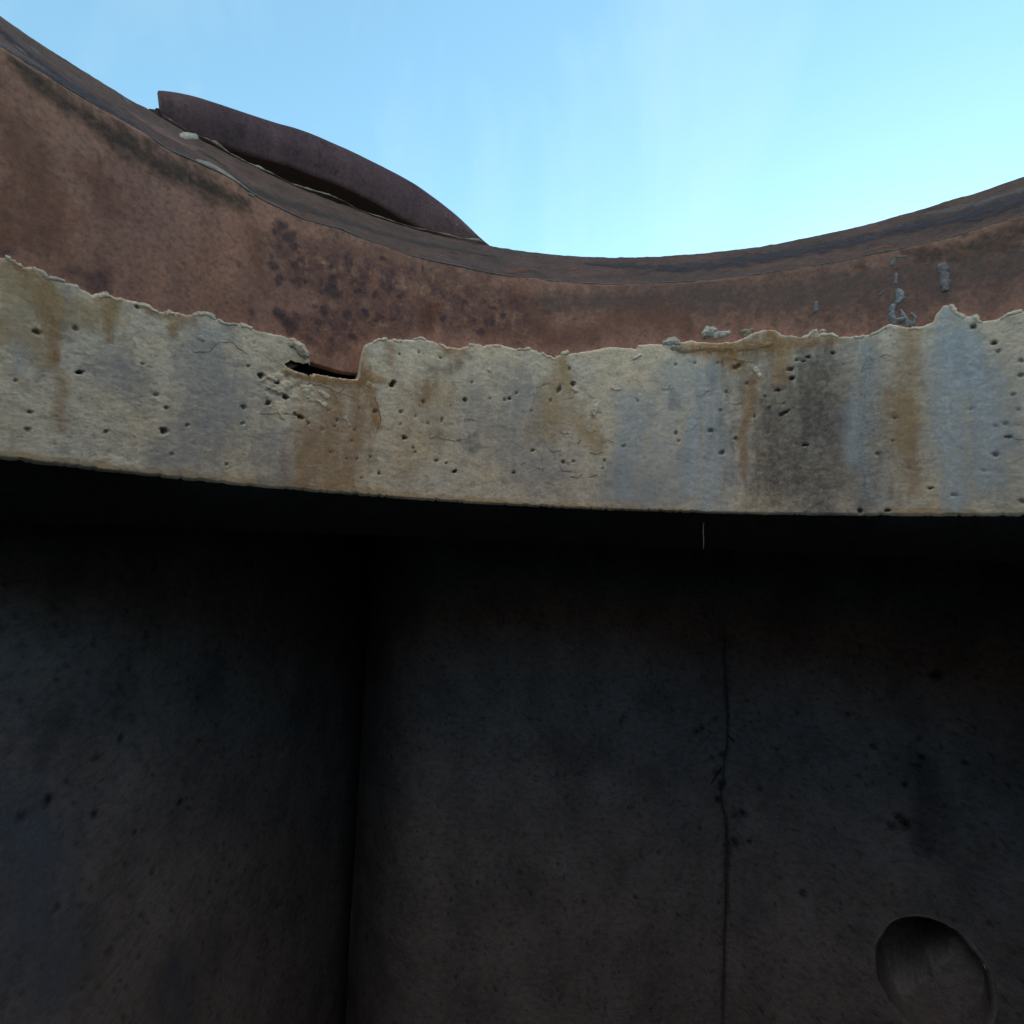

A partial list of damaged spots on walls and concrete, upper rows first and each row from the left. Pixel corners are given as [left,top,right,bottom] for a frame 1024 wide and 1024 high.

corrosion [286,369,386,491]
water stain [0,354,685,511]
water stain [540,194,1024,513]
crack [711,640,735,997]